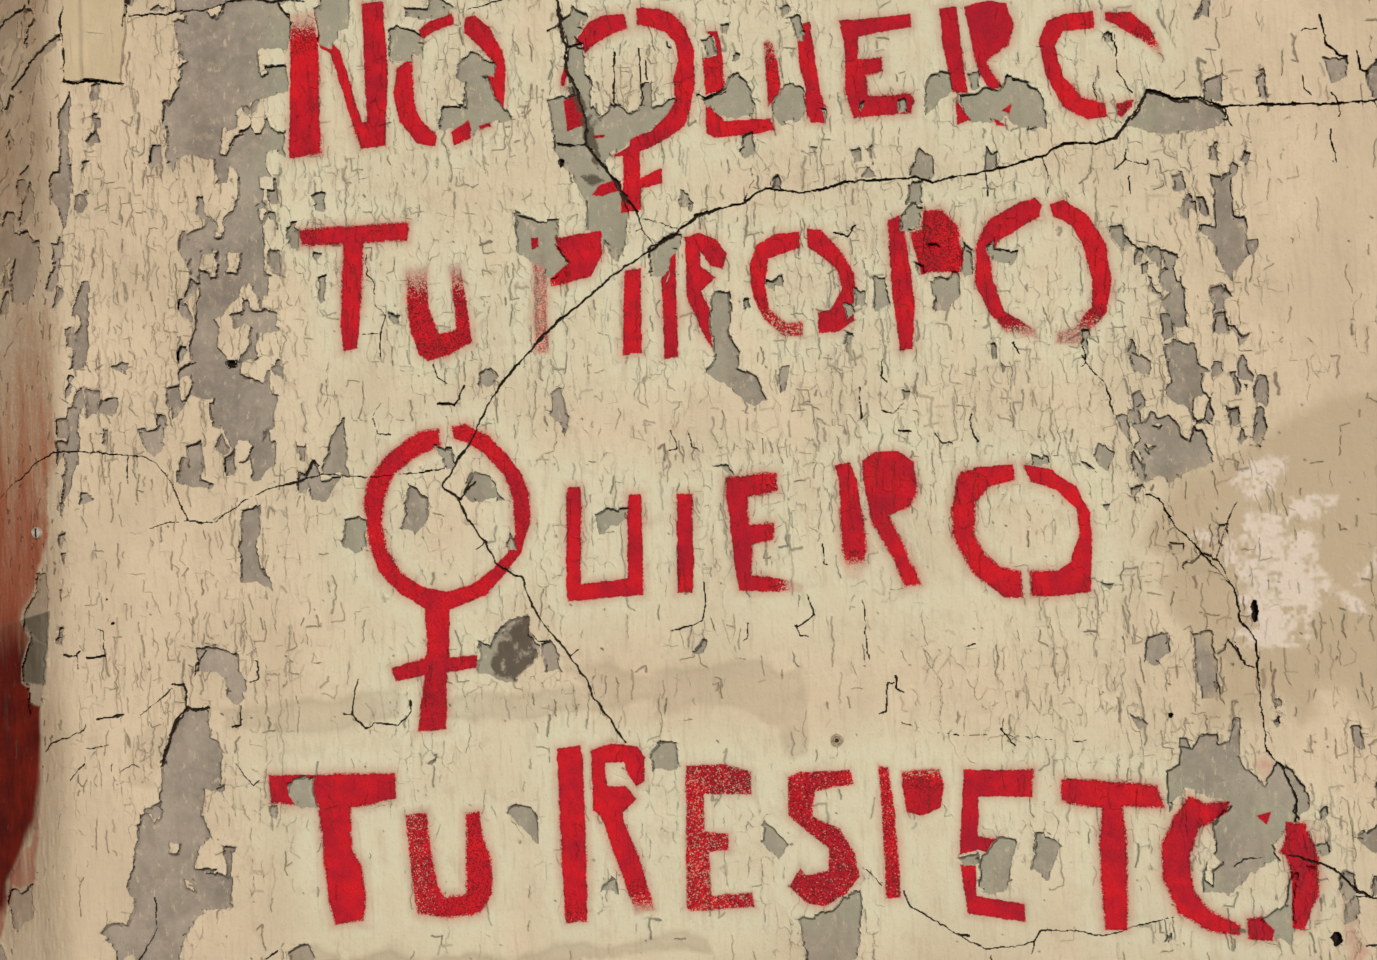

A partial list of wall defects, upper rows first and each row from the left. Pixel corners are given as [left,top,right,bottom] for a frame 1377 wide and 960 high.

rust [0,113,46,213]
rust [0,261,66,583]
crack [45,647,260,781]
peeling [97,640,250,960]
peeling [124,0,354,596]
peeling [543,3,697,282]
crack [1,0,1377,746]
peeling [1075,68,1272,519]
crack [1145,493,1300,822]
peeling [1160,713,1334,949]
damp [1132,382,1377,736]
crack [1234,855,1377,899]